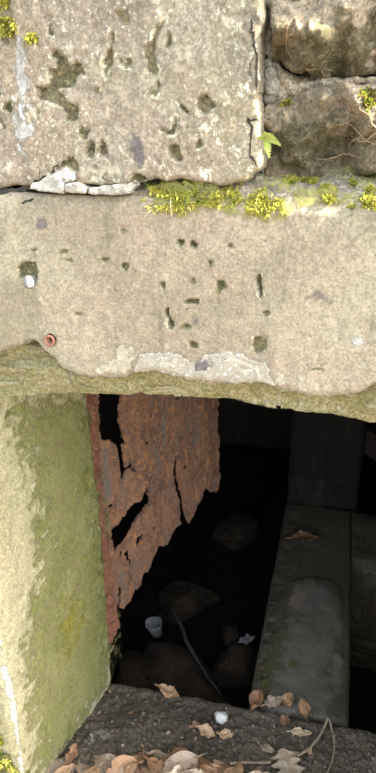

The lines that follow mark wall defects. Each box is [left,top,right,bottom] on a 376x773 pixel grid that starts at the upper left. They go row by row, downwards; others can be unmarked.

spalling [162,307,193,331]
spalling [0,336,376,423]
corrosion [85,392,221,645]